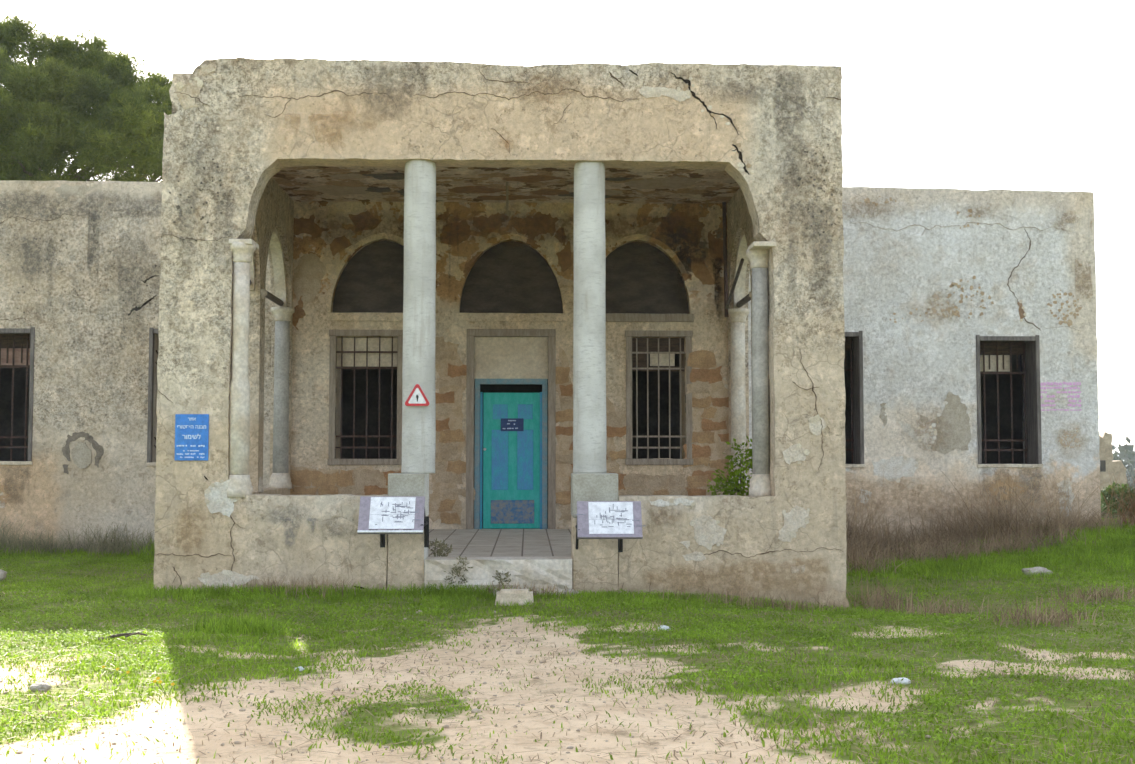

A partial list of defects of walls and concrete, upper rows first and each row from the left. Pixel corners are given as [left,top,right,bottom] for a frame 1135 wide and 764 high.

crack [174,65,638,124]
crack [671,72,755,174]
peeling [294,211,383,256]
peeling [362,172,405,196]
peeling [440,175,574,247]
peeling [556,241,572,272]
crack [853,221,1080,331]
peeling [556,348,573,521]
peeling [606,349,729,561]
crack [793,353,828,467]
peeling [920,391,971,455]
peeling [204,479,241,517]